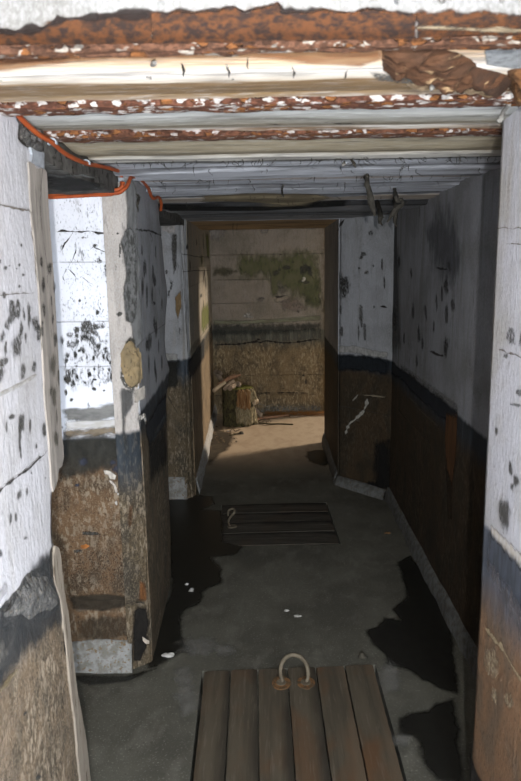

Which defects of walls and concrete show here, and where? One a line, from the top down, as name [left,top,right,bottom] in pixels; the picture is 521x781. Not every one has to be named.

corrosion [0,2,521,45]
corrosion [0,57,144,70]
corrosion [235,51,381,66]
spalling [372,49,521,108]
crack [0,169,113,296]
leakage [117,180,179,480]
leakage [184,261,320,387]
leakage [43,297,145,505]
crack [0,452,46,492]
leakage [208,430,233,462]
leakage [0,556,62,694]